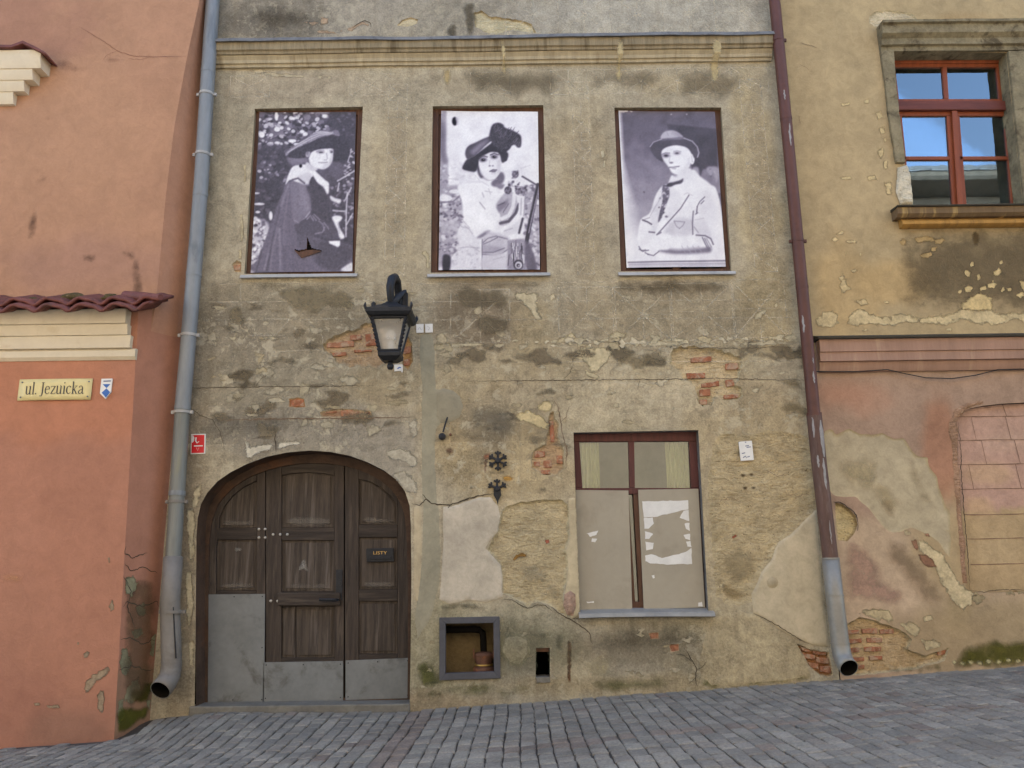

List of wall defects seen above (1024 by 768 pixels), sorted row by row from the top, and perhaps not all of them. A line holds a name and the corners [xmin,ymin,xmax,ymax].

flaking render [434,261,1024,417]
flaking render [210,323,418,458]
flaking render [386,448,418,493]
crack [415,494,488,508]
flaking render [507,400,571,476]
flaking render [707,404,985,611]
flaking render [488,489,569,617]
peeling [84,648,151,724]
crack [120,548,159,671]
crack [504,599,593,644]
flaking render [797,644,833,677]
flaking render [847,607,949,675]